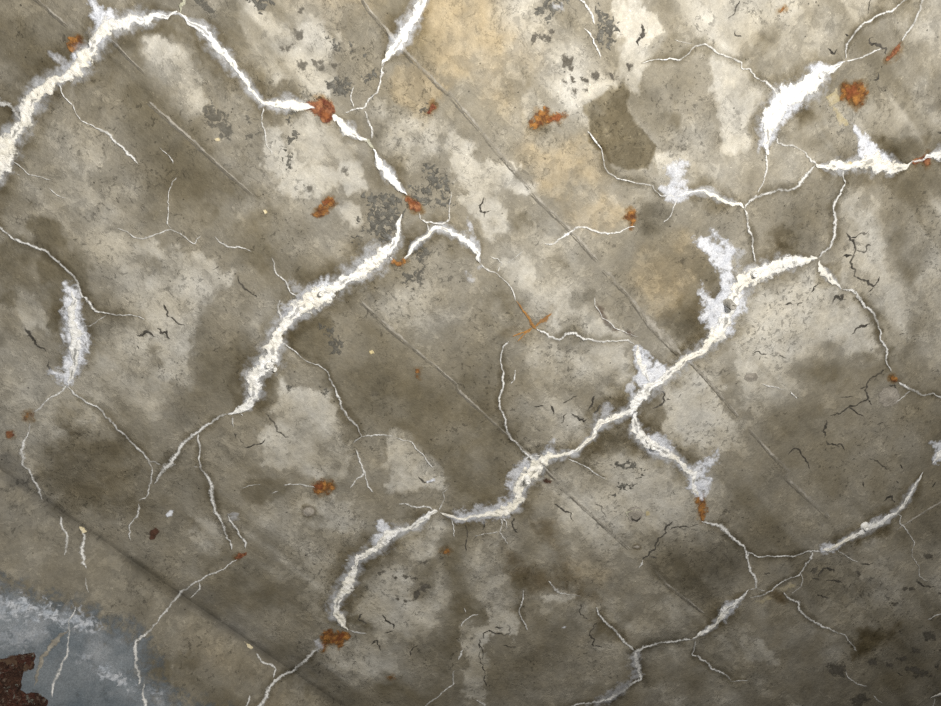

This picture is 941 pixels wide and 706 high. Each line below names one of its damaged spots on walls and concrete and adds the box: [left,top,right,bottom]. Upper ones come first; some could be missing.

water stain [0,0,314,198]
corrosion [306,92,335,123]
corrosion [529,106,566,129]
water stain [0,227,148,459]
water stain [128,193,515,538]
water stain [331,0,941,634]
crack [786,233,940,450]
crack [930,441,941,486]
corrosion [0,652,48,706]
crack [133,435,247,706]
crack [246,649,318,706]
corrosion [320,629,351,652]